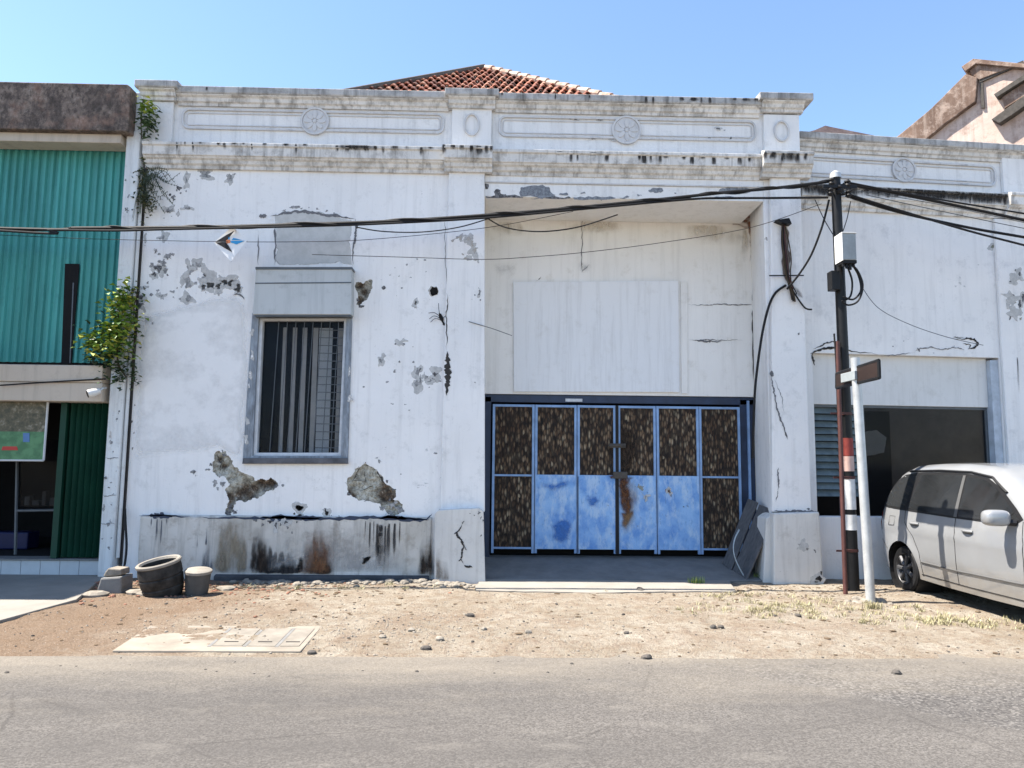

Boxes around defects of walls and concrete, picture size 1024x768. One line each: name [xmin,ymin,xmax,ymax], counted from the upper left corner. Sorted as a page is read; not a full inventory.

leakage [420,144,493,153]
peeling [485,184,676,201]
peeling [135,231,243,324]
spalling [355,280,386,308]
crack [444,227,452,395]
crack [688,303,788,439]
crack [811,337,979,365]
spalling [190,450,284,515]
spalling [345,457,404,516]
rust [610,425,634,526]
leakage [202,521,400,574]
crack [454,521,472,568]